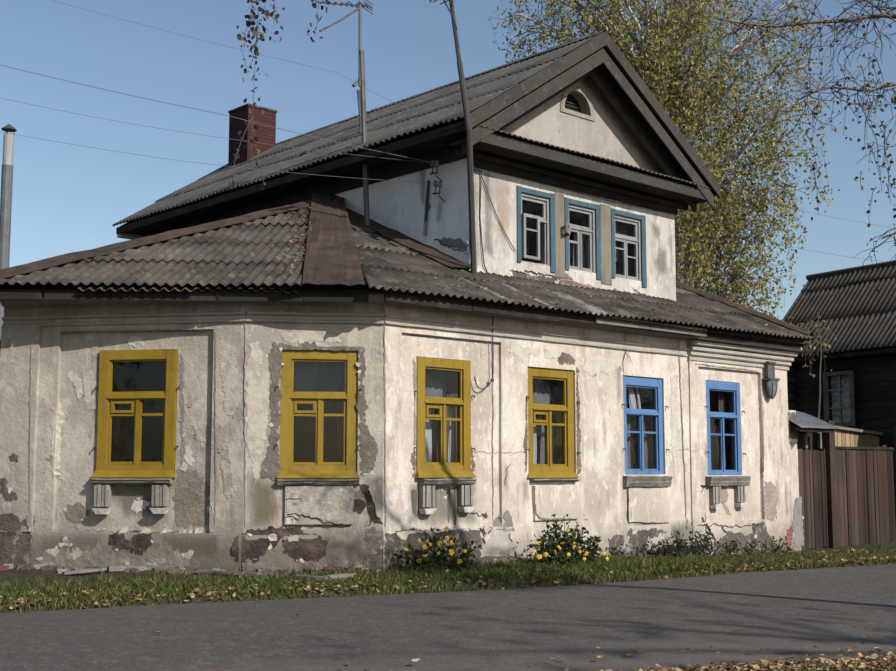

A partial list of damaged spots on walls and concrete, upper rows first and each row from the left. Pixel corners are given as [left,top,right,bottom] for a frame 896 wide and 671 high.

flaking render [0,355,213,569]
peeling [217,331,520,572]
crack [284,308,489,528]
flaking render [608,527,681,556]
crack [627,339,765,541]
flaking render [714,481,804,556]